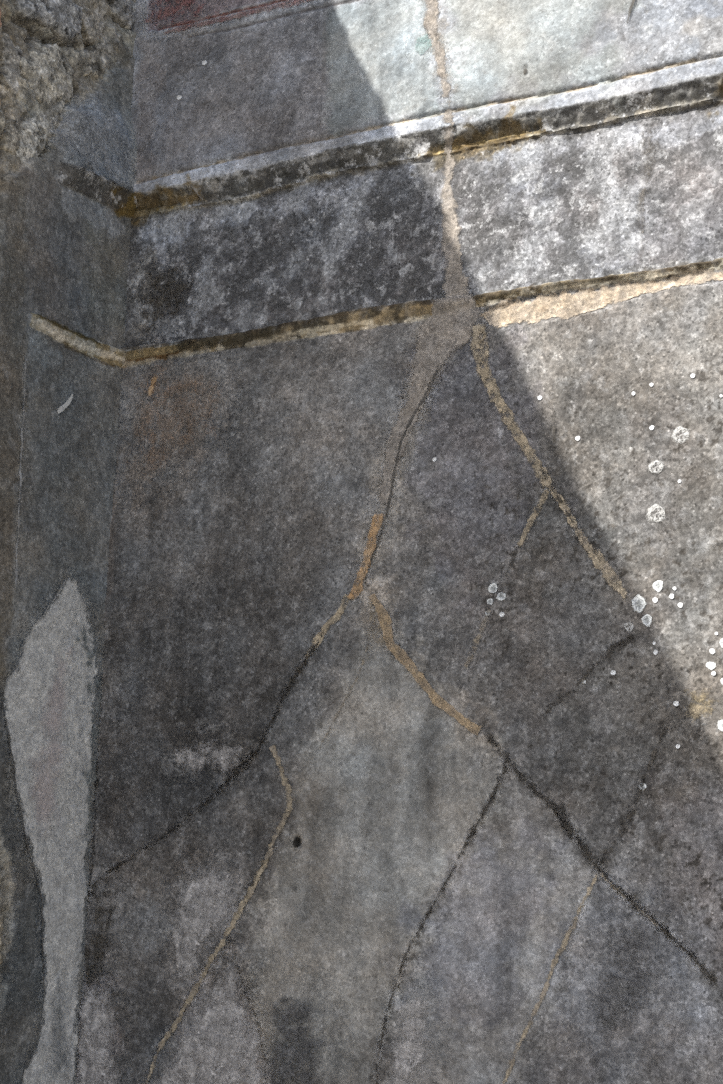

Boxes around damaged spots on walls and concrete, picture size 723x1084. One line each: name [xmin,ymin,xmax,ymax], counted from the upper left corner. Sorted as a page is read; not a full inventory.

crack [87,594,350,1082]
crack [325,0,716,1084]